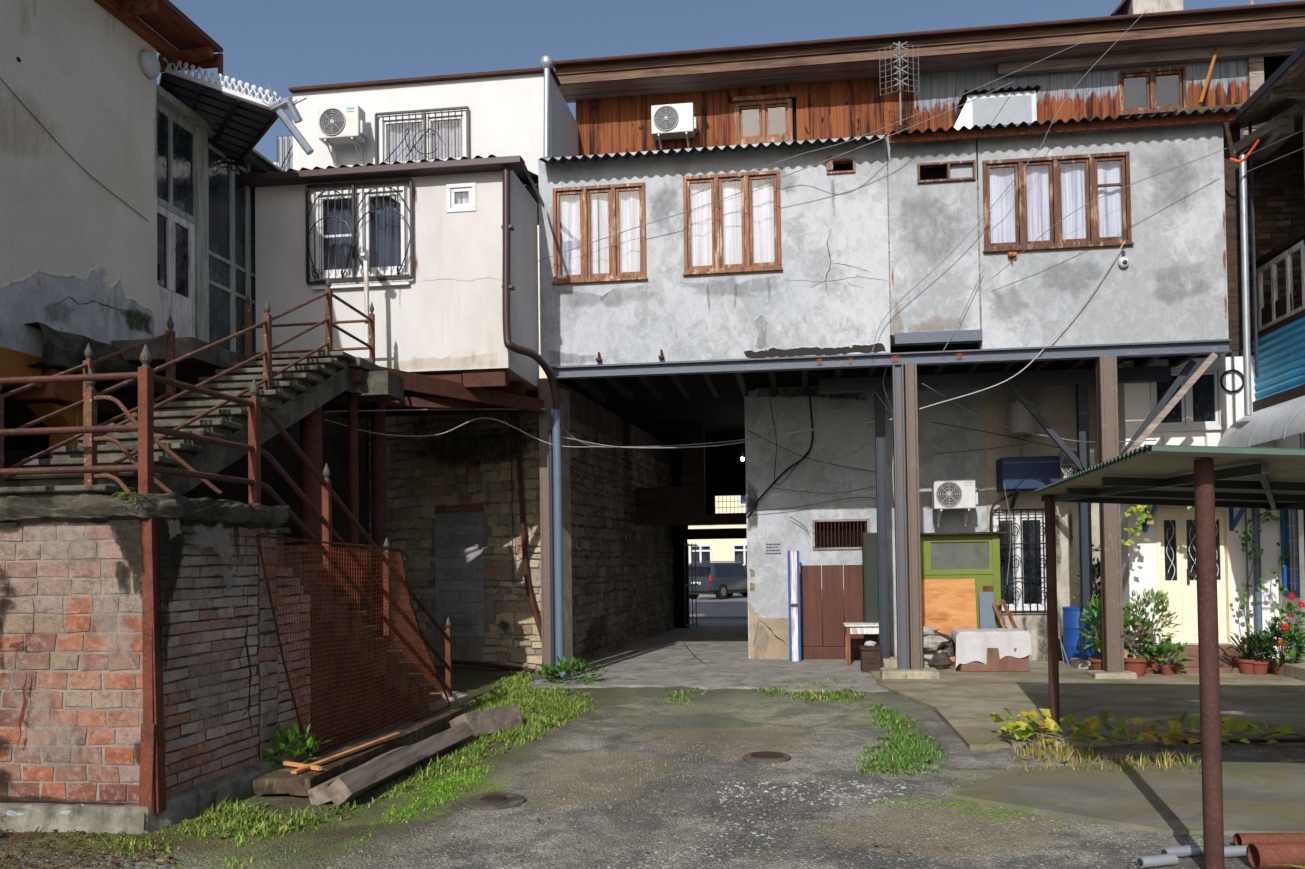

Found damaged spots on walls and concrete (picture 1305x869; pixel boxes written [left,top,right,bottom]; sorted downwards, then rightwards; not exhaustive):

crack [788,231,887,289]
flaking render [0,263,155,356]
damp [0,521,19,529]